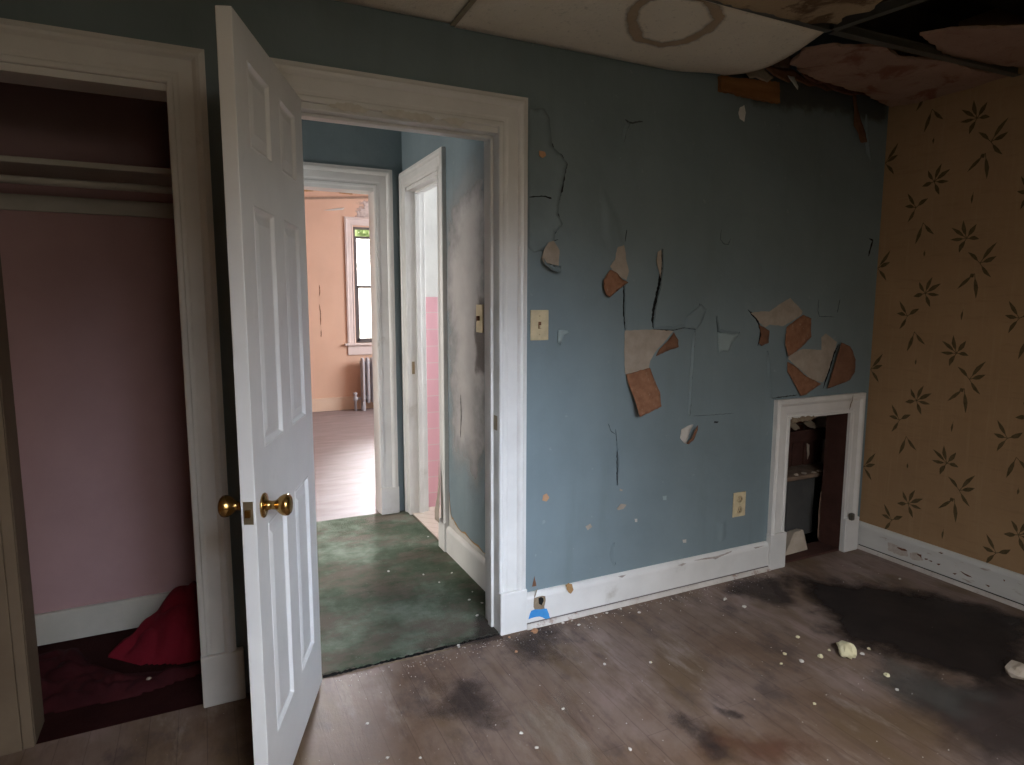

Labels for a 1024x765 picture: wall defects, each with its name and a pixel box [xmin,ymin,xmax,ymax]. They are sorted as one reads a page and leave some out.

damp [627,0,724,47]
crack [623,249,740,334]
peeling [751,298,803,327]
peeling [624,329,673,374]
peeling [788,334,837,383]
peeling [680,425,693,444]
damp [731,577,1024,763]
damp [443,682,489,718]